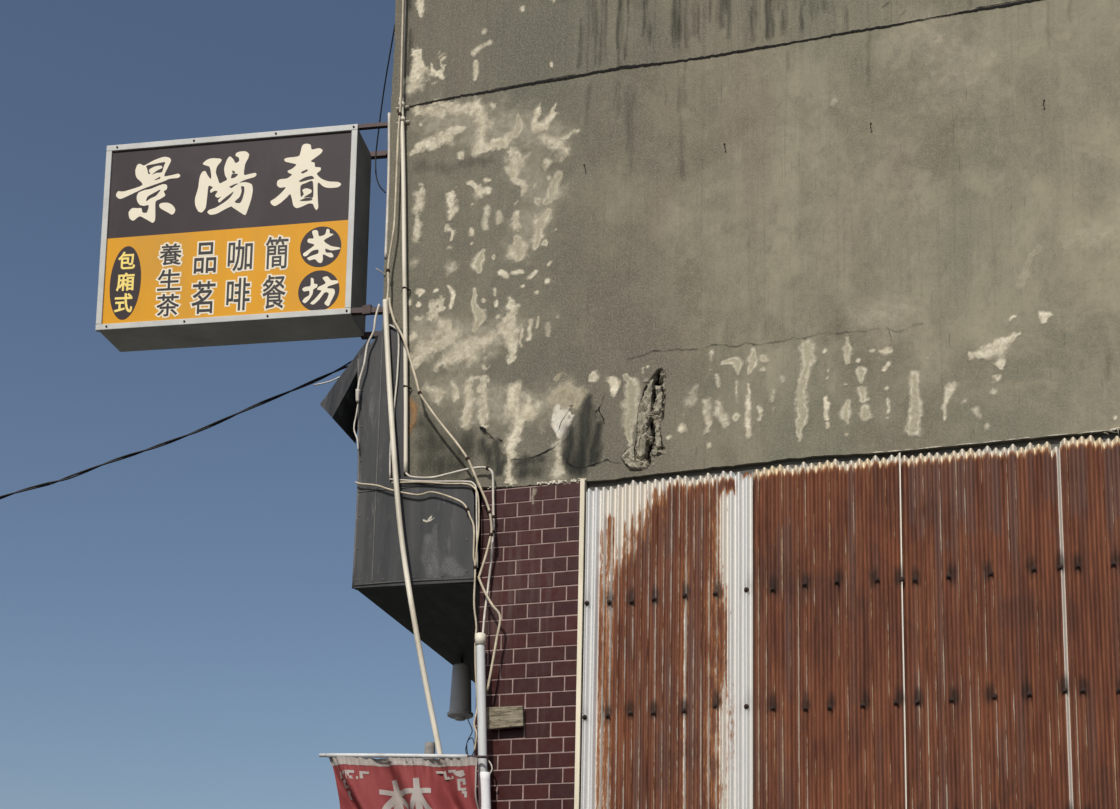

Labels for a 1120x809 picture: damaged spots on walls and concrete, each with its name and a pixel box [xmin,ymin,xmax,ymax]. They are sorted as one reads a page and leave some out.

crack [409,0,1035,107]
flaking render [551,404,574,443]
spalling [621,367,667,471]